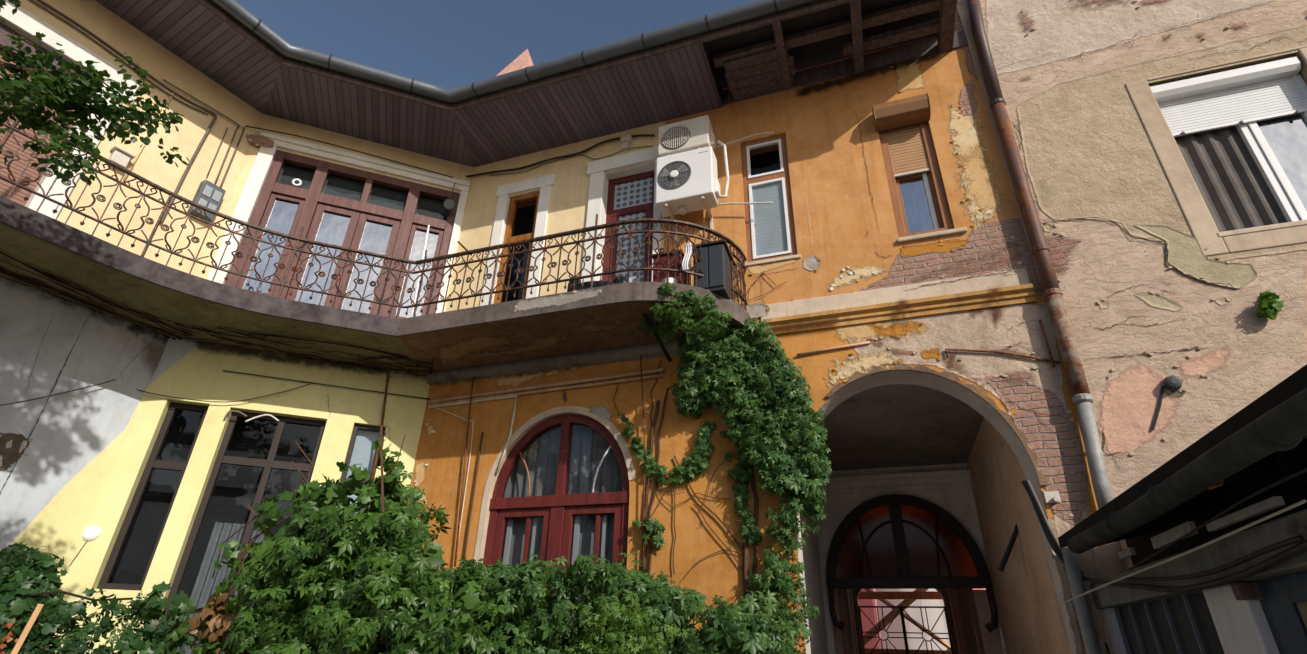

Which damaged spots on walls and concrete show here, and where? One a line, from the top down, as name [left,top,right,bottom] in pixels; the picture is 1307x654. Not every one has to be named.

flaking render [1073,0,1168,10]
crack [1010,120,1243,361]
flaking render [815,9,1128,654]
flaking render [0,433,33,471]
flaking render [1098,346,1232,458]